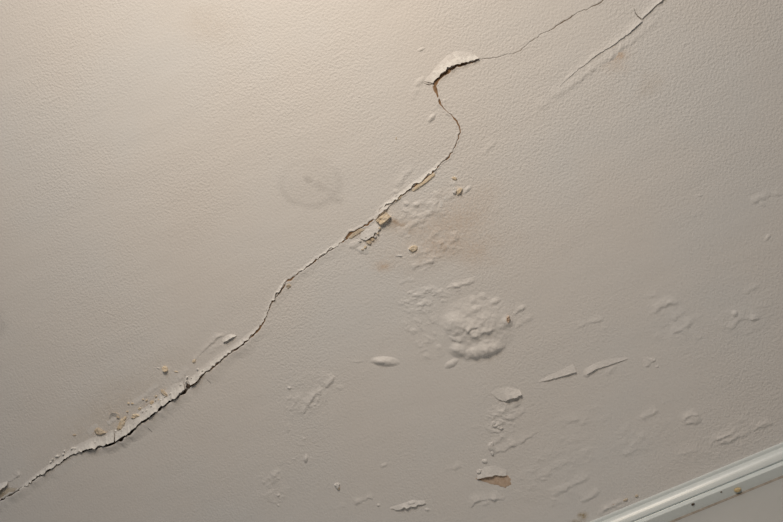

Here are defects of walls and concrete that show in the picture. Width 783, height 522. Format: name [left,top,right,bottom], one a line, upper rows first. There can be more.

peeling [407,51,480,112]
crack [478,0,607,61]
crack [532,0,662,115]
crack [0,82,463,513]
peeling [470,387,541,488]